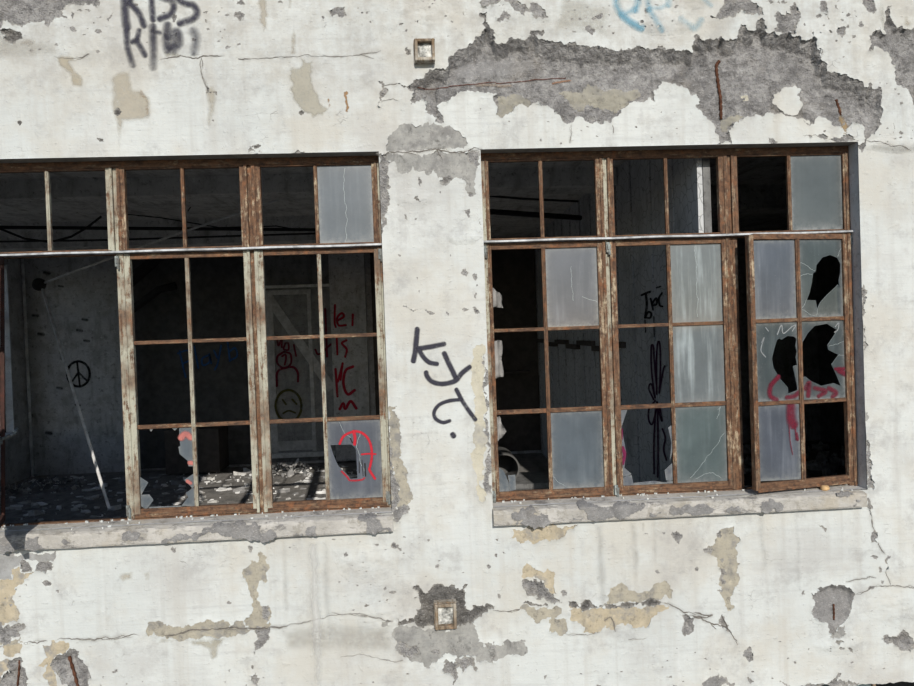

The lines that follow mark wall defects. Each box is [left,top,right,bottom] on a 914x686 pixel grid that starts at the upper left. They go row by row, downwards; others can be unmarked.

peeling [0,0,113,52]
spalling [379,0,914,233]
crack [849,511,912,595]
peeling [522,579,668,612]
peeling [0,622,26,645]
crack [25,634,137,644]
crack [161,613,386,636]
flaking render [379,576,528,686]
spalling [801,584,858,663]
spalling [0,657,28,686]
spalling [51,649,91,686]
flaking render [694,652,735,686]